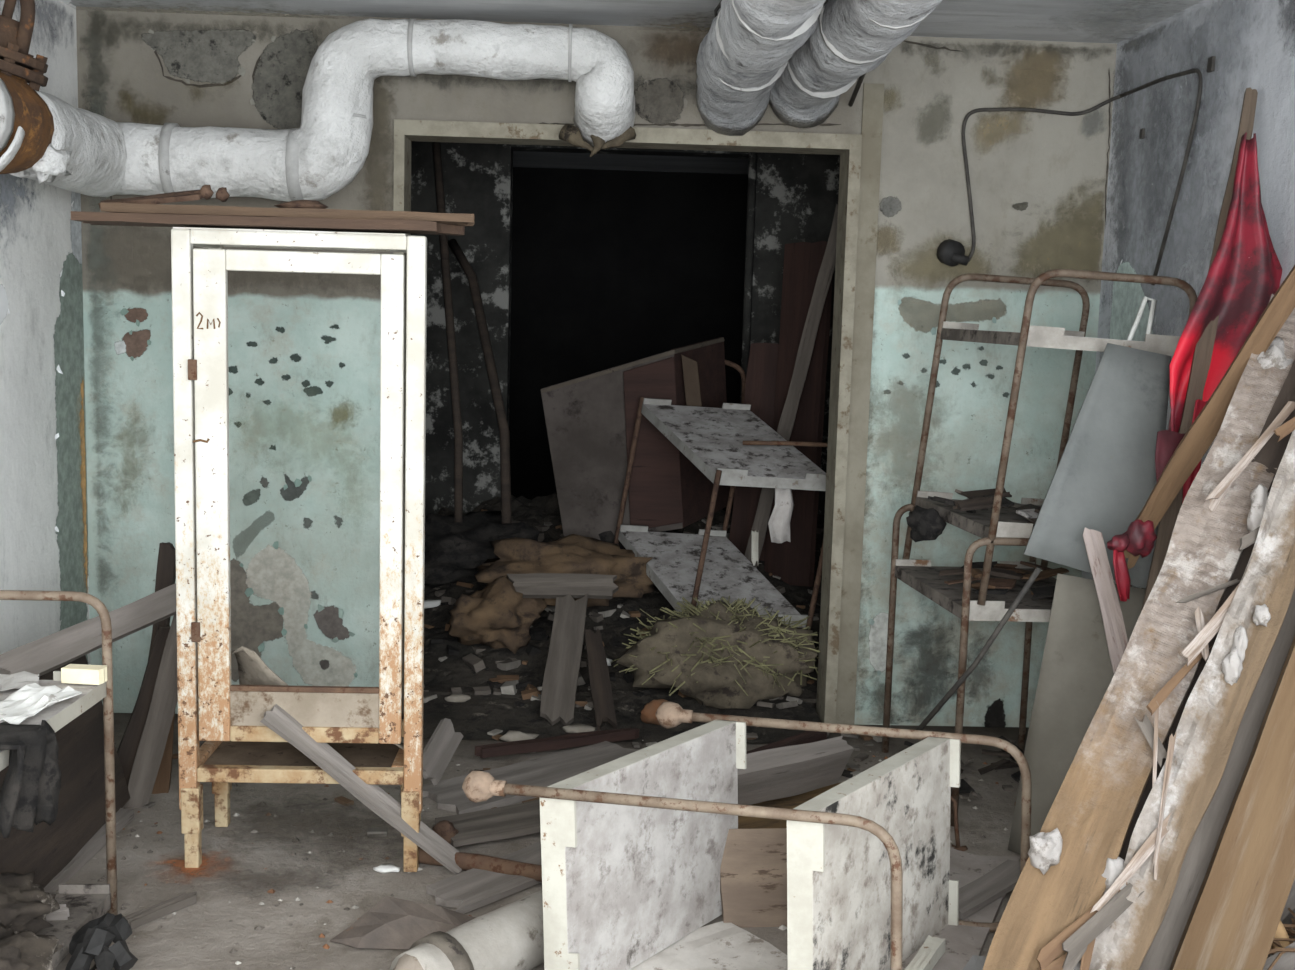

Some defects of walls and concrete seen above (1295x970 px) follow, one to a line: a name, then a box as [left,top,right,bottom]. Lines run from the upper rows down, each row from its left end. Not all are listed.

leakage [977,0,1245,335]
leakage [0,174,35,221]
spalling [880,197,901,217]
peeling [114,308,151,361]
peeling [898,297,1006,335]